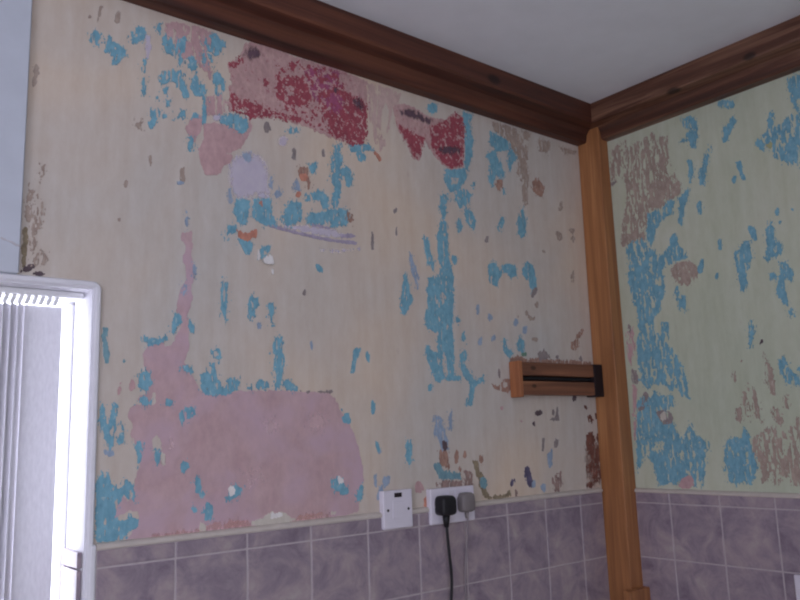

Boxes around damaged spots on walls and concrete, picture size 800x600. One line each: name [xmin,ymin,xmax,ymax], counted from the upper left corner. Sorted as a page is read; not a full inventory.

peeling [221,141,381,275]
peeling [399,110,510,407]
peeling [478,261,539,359]
peeling [485,121,577,238]
peeling [610,132,712,489]
peeling [678,115,700,149]
peeling [734,208,796,317]
peeling [755,71,800,168]
flaking render [94,209,364,543]
peeling [432,409,454,452]
peeling [472,438,563,500]
flaking render [723,319,800,488]